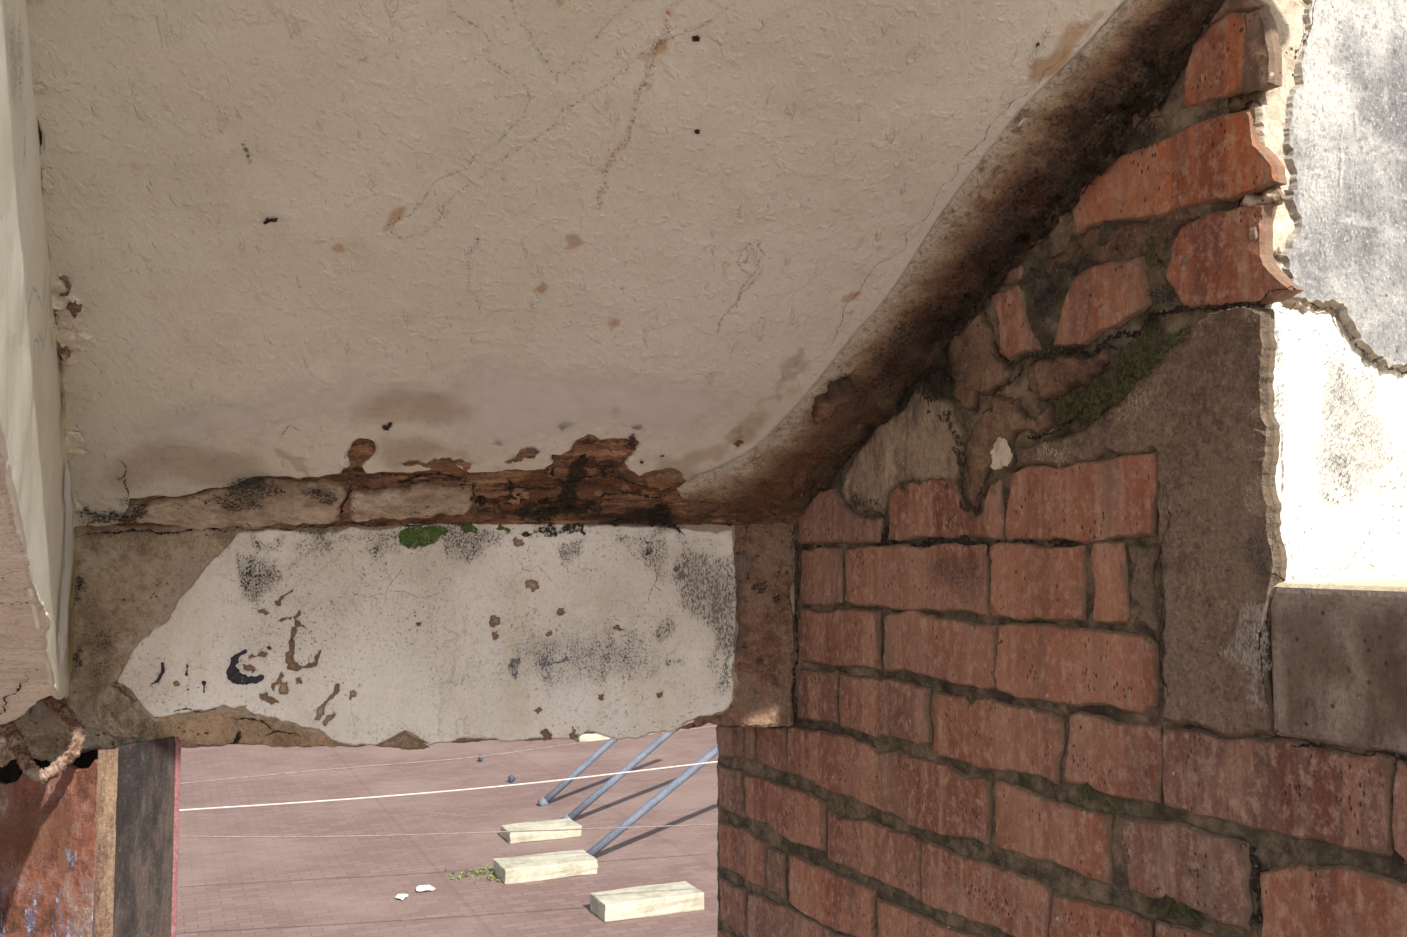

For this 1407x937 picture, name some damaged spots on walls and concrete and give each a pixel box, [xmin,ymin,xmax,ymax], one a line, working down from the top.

spalling [0,589,356,783]
water stain [208,477,338,515]
water stain [235,522,512,605]
spalling [353,423,682,528]
peeling [811,376,856,425]
water stain [513,0,1207,697]
water stain [1239,316,1291,586]
crack [1257,563,1407,714]
crack [1291,742,1407,762]
water stain [1304,336,1407,521]